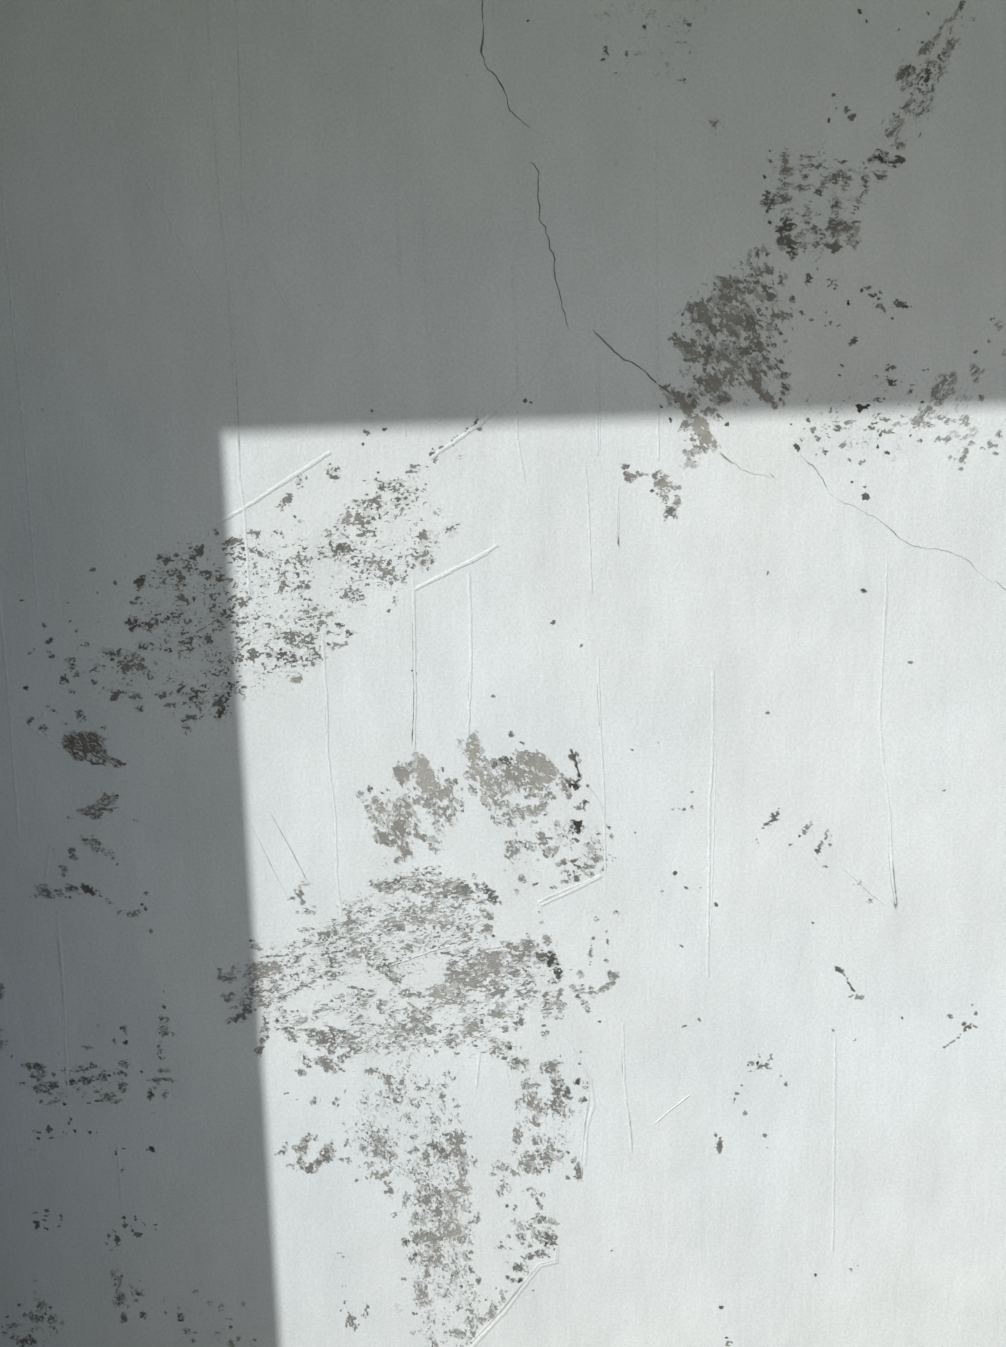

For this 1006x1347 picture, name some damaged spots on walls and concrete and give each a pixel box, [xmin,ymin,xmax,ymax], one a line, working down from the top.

crack [480,0,531,128]
crack [526,161,673,397]
peeling [621,0,1006,522]
peeling [25,415,483,769]
crack [719,452,776,479]
crack [799,450,1006,590]
peeling [29,791,155,934]
peeling [0,990,176,1151]
peeling [215,729,621,1347]